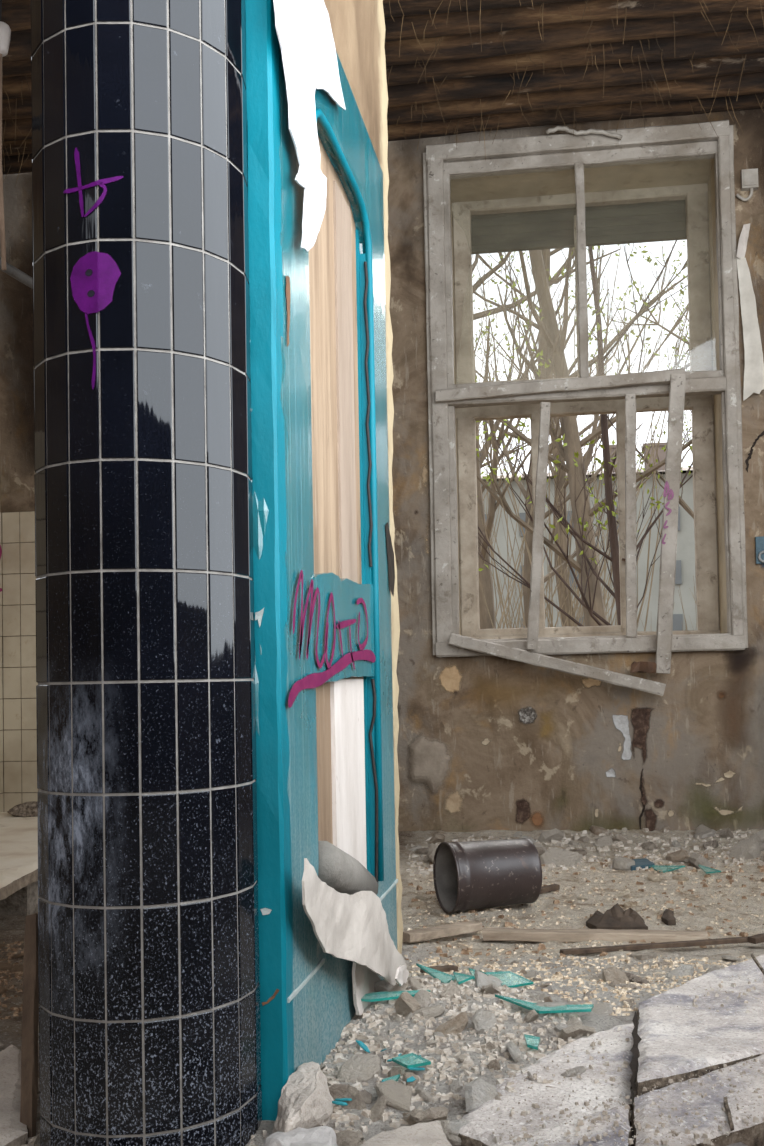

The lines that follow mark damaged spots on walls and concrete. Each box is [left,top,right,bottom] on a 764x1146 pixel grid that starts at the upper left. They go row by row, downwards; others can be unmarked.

peeling [273,0,346,252]
crack [745,431,764,472]
flaking render [409,735,463,813]
flaking render [606,707,674,831]
crack [638,769,646,830]
flaking render [352,962,381,1016]
crack [629,1011,642,1094]